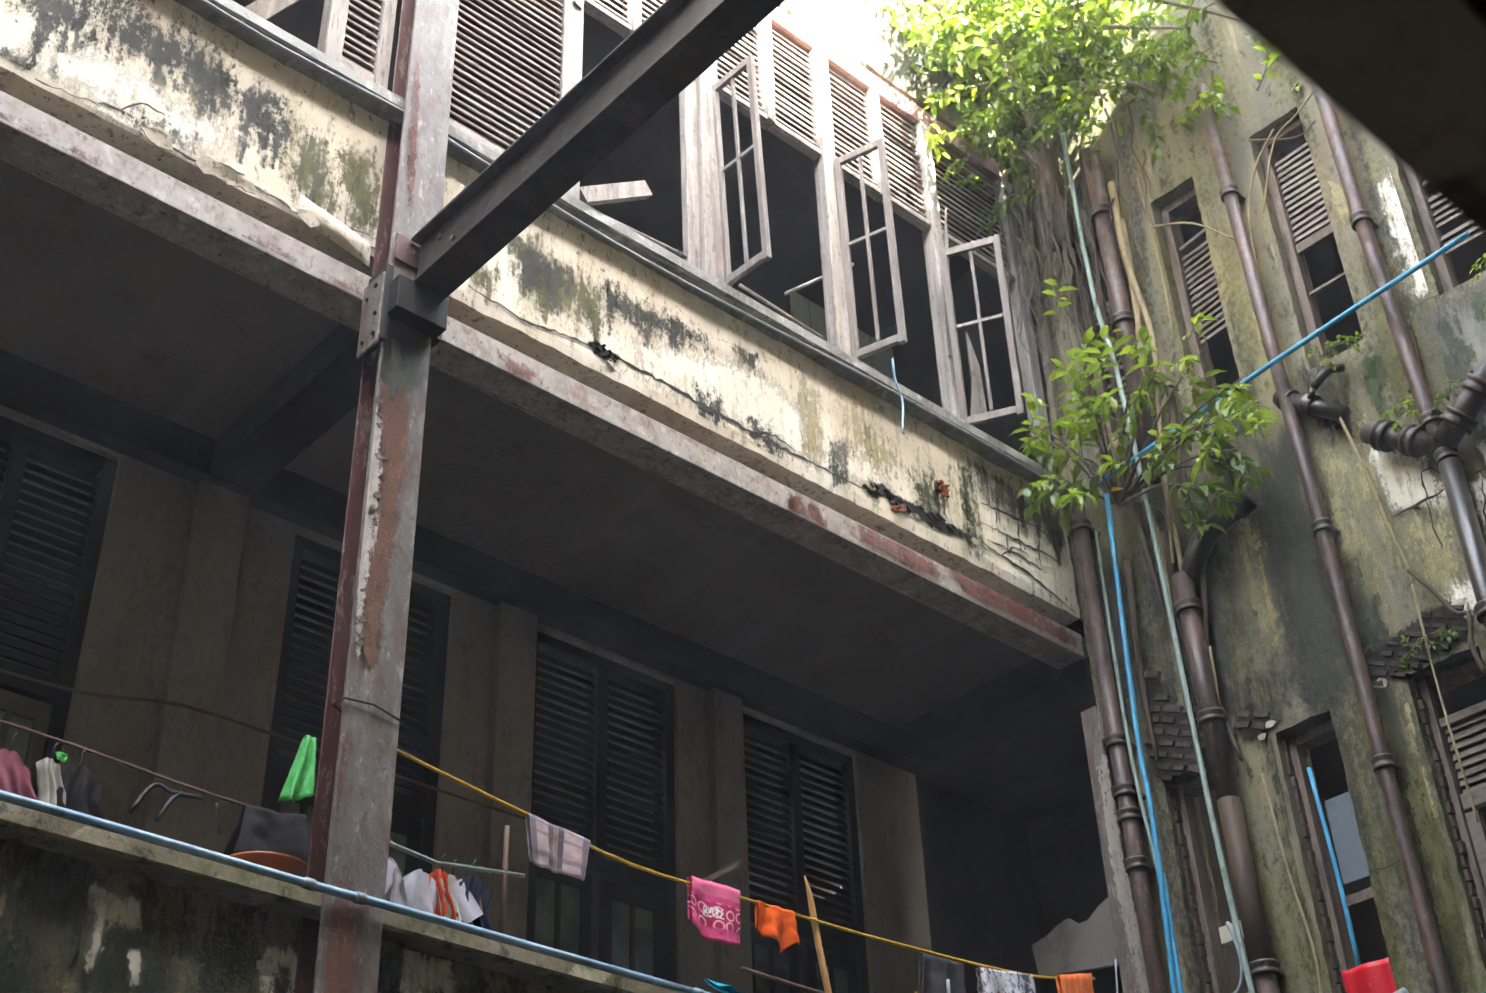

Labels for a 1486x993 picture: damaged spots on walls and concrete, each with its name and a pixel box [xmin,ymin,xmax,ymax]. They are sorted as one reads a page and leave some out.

peeling [32,42,267,197]
leakage [0,0,383,241]
leakage [469,233,714,359]
crack [468,284,865,489]
leakage [691,382,783,459]
peeling [586,336,980,545]
leakage [798,377,1067,565]
leakage [1085,534,1198,735]
spalling [1142,670,1208,785]
leakage [1200,289,1486,835]
peeling [1377,173,1428,303]
spalling [1366,577,1476,688]